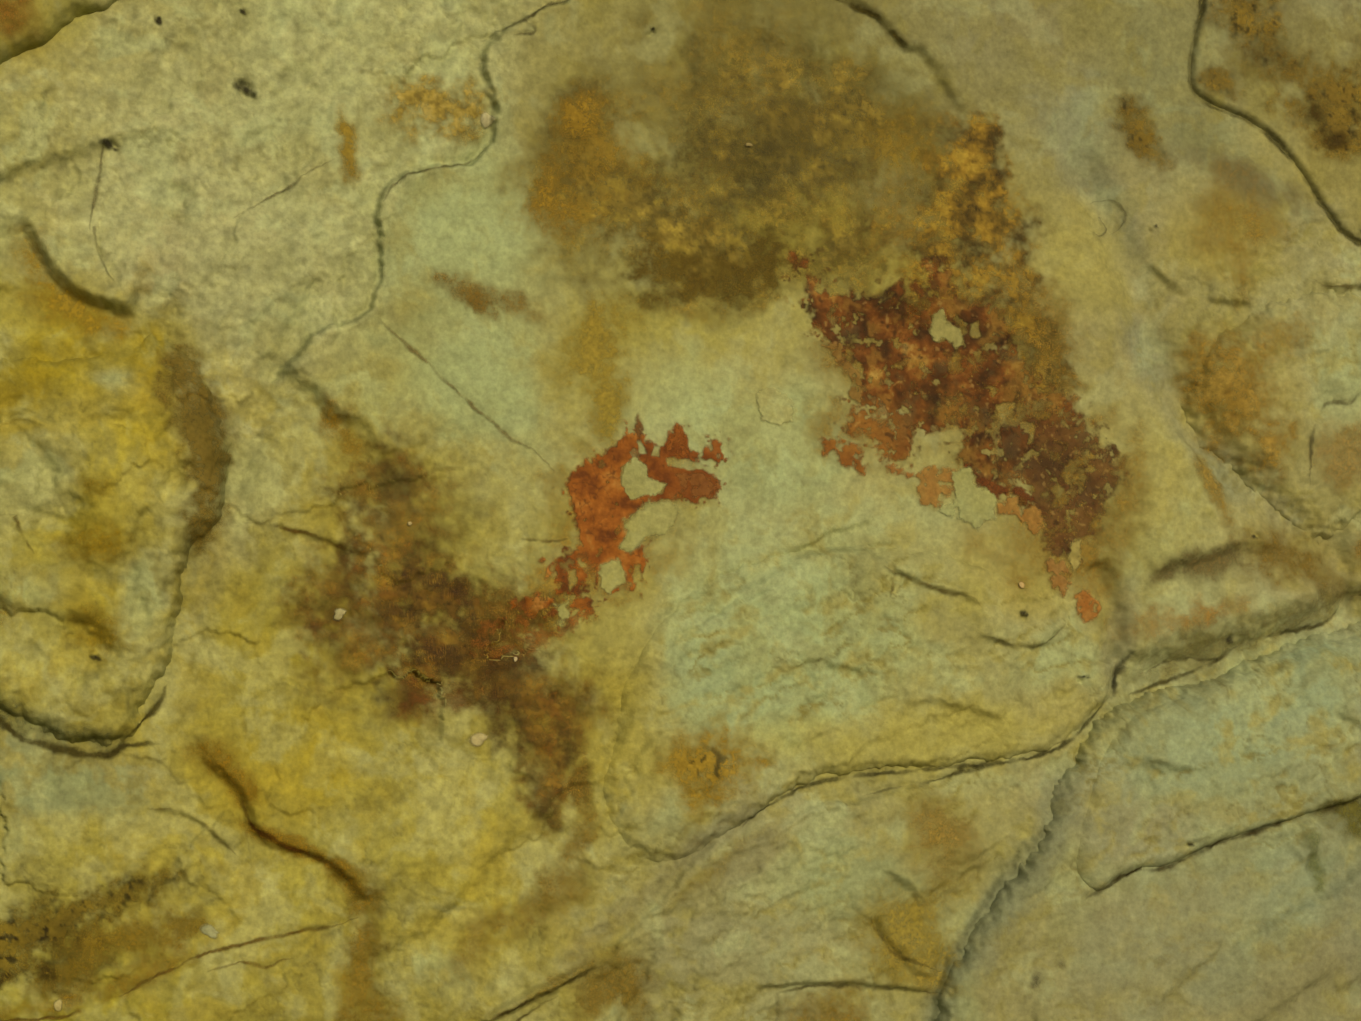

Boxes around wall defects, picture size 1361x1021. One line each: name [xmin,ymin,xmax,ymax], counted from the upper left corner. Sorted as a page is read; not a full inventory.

crack [851,4,905,46]
crack [1189,0,1291,157]
leakage [1211,0,1361,159]
leakage [528,2,947,441]
crack [1318,198,1361,245]
corrosion [786,112,1129,622]
corrosion [480,415,727,659]
crack [0,697,163,758]
leakage [286,445,597,928]
crack [1268,620,1328,637]